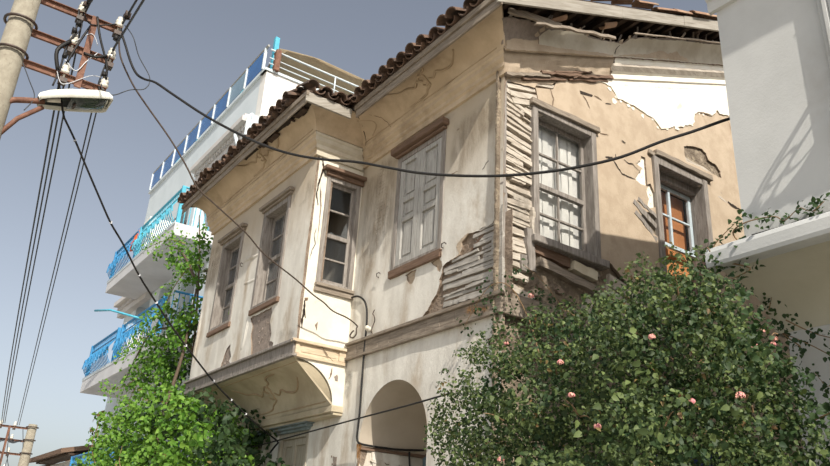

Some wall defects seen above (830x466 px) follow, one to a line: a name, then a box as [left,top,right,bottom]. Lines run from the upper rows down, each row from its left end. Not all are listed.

flaking render [505,26,723,66]
flaking render [427,70,729,315]
spalling [252,308,273,354]